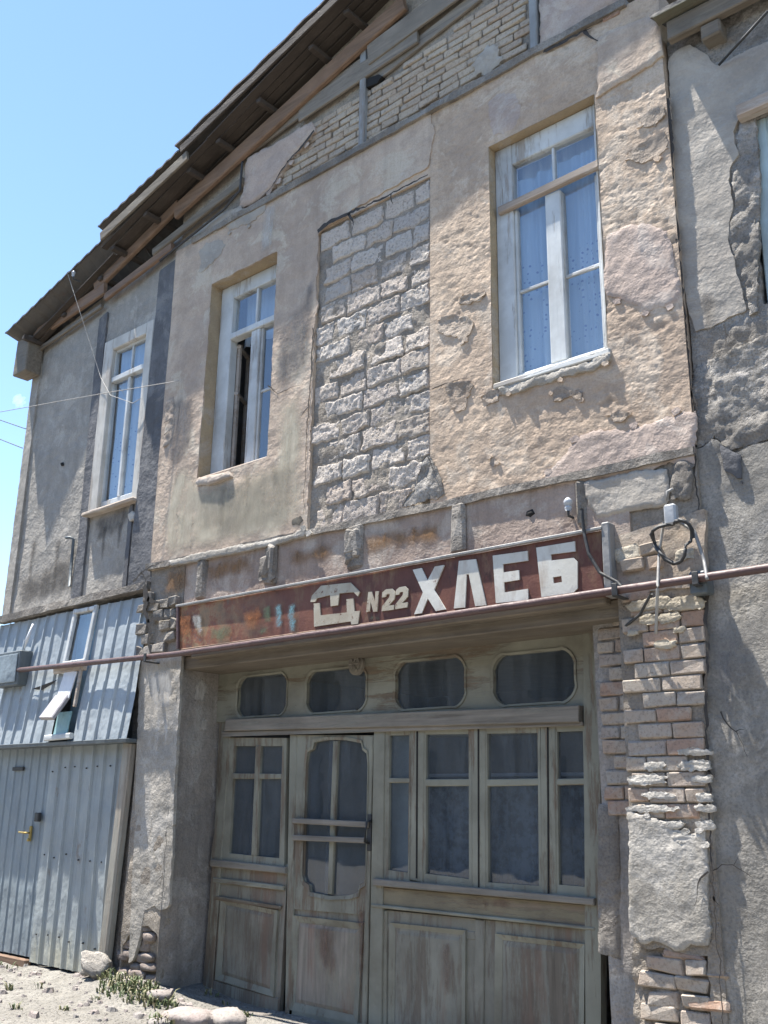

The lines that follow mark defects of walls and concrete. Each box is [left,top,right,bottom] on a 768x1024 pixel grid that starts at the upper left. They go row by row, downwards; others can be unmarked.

flaking render [192,122,317,273]
crack [317,175,427,233]
flaking render [444,380,512,412]
flaking render [548,377,585,403]
spalling [135,592,228,655]
flaking render [544,407,732,1024]